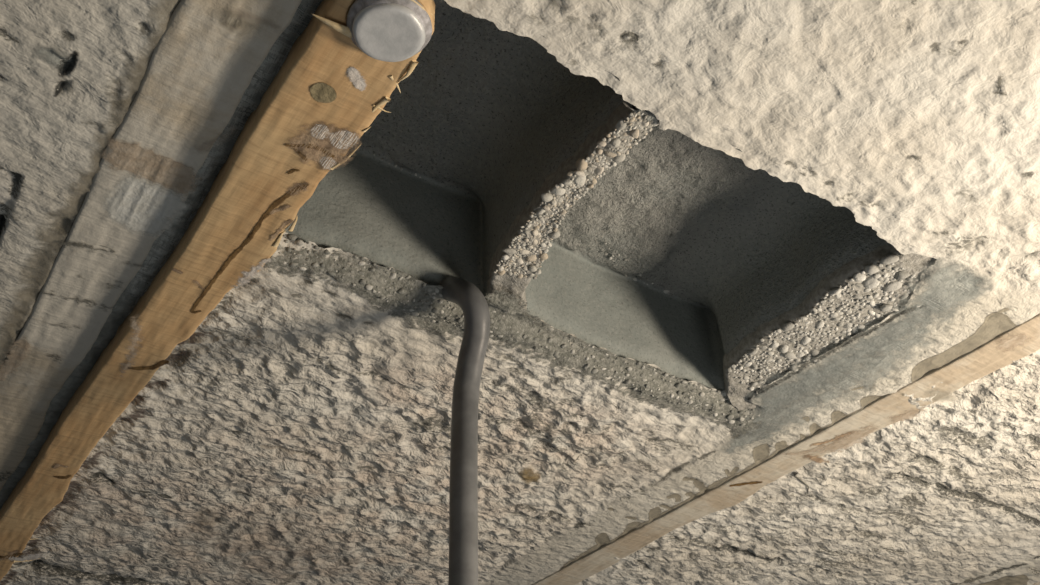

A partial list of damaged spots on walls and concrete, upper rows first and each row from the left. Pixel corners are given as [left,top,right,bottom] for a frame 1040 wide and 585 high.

crack [0,0,181,369]
spalling [493,110,660,279]
crack [117,278,260,423]
spalling [485,354,624,469]
leakage [818,426,874,453]
leakage [890,408,925,424]
crack [0,451,162,585]